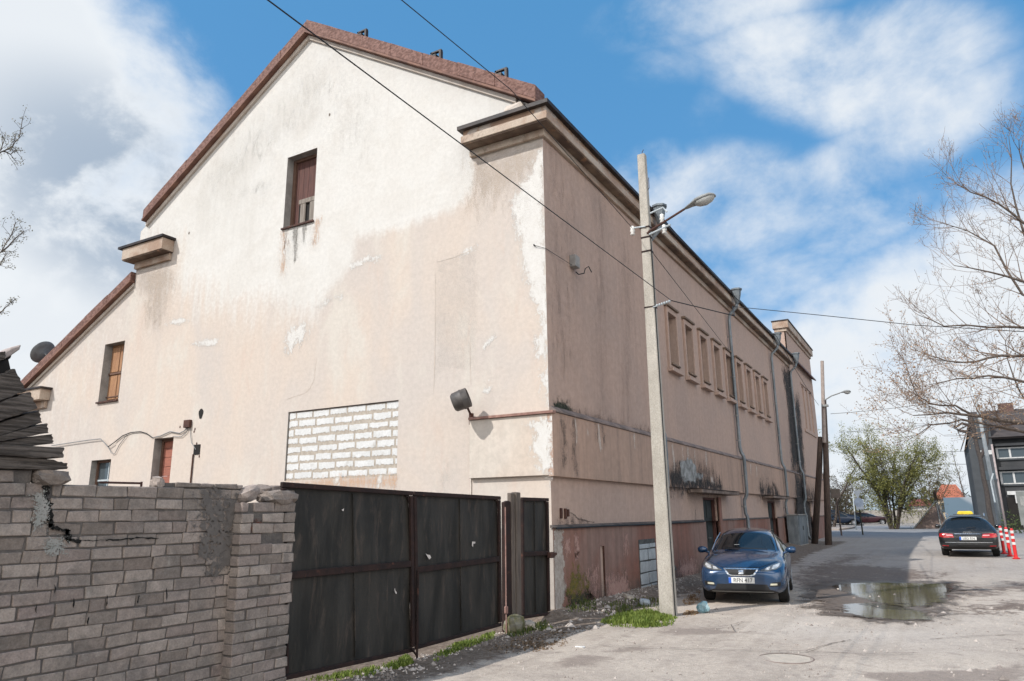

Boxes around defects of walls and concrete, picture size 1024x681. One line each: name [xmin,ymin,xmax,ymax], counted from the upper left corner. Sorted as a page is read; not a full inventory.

damp [286,223,313,265]
peeling [509,149,553,489]
crack [42,485,158,544]